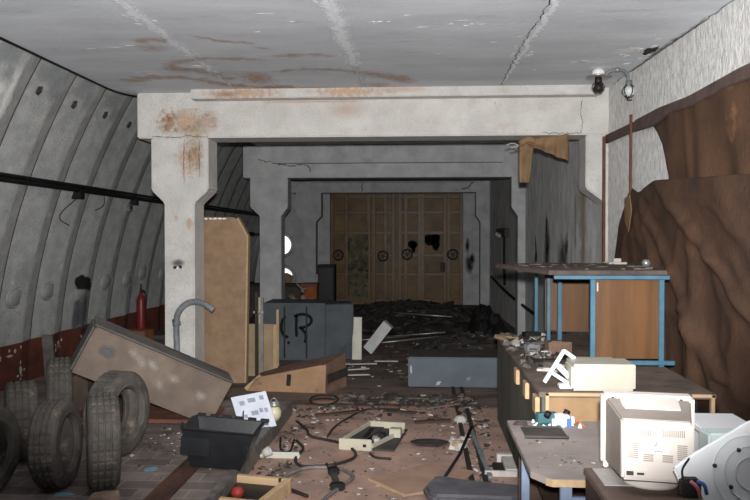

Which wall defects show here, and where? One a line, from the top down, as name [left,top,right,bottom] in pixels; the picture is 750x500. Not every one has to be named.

crack [109,0,237,89]
crack [312,0,373,87]
crack [500,0,567,86]
spalling [623,21,703,70]